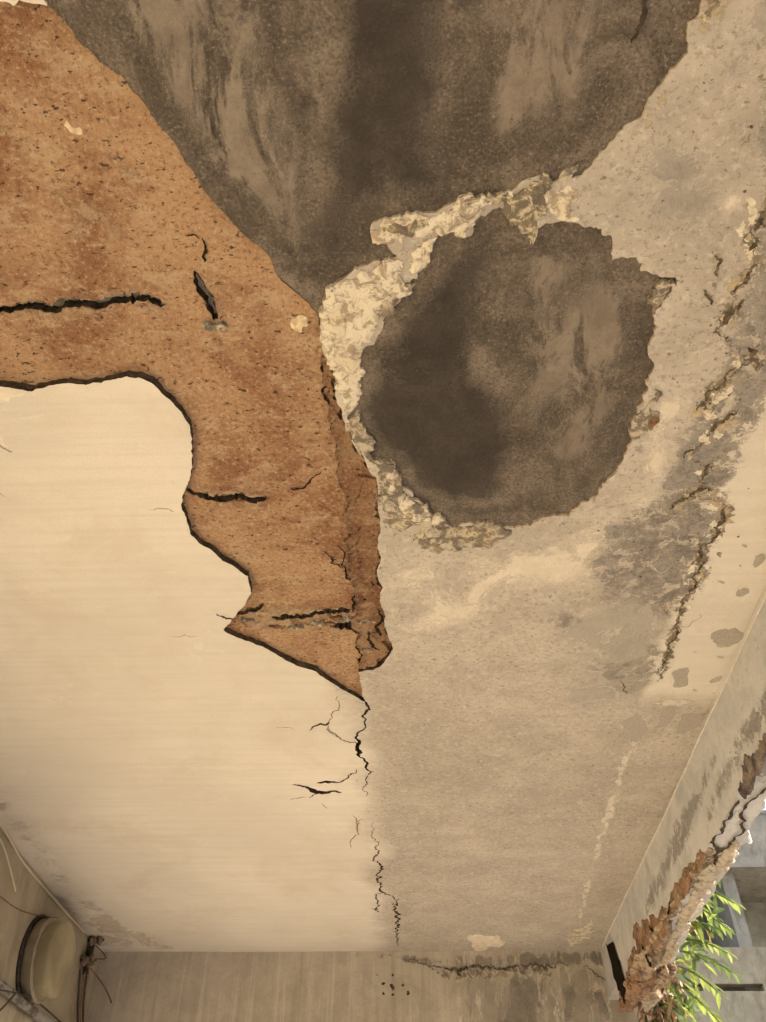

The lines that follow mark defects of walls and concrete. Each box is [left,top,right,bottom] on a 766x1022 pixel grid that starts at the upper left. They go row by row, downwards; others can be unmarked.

damp [127,0,444,256]
damp [492,0,614,134]
crack [630,0,648,44]
spalling [0,0,727,702]
damp [364,251,517,516]
damp [403,223,766,706]
crack [648,188,766,682]
crack [277,697,626,1003]
crack [641,902,690,967]
spalling [618,847,718,1013]
damp [646,692,766,912]
spalling [738,733,766,799]